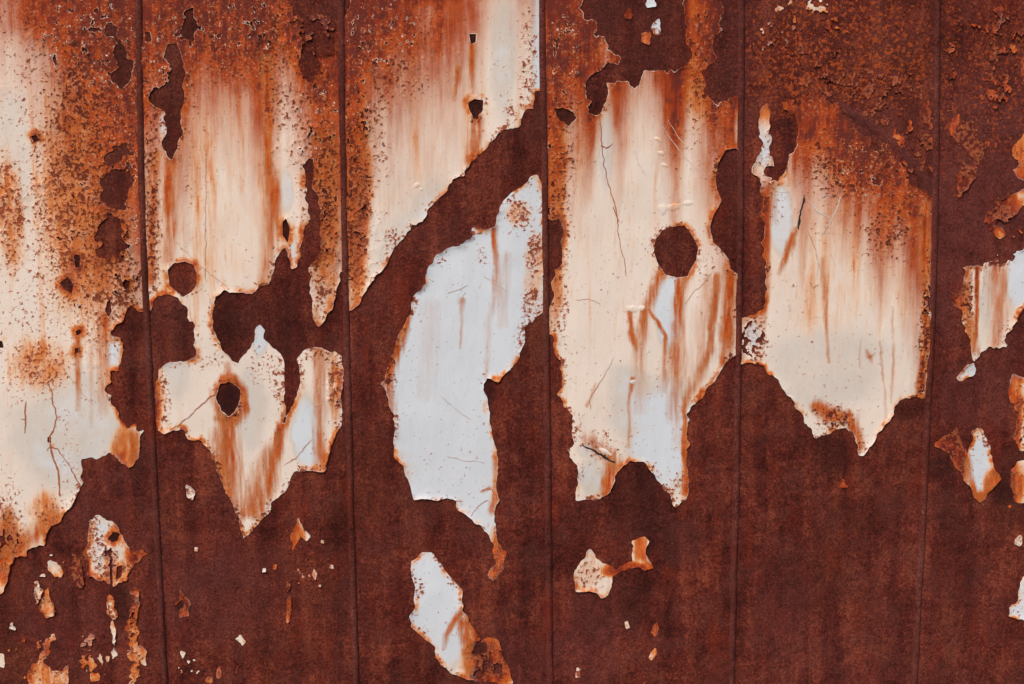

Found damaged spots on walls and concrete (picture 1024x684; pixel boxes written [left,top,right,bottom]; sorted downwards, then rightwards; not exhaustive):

crack [20,362,93,496]
corrosion [0,0,481,287]
corrosion [213,369,291,518]
peeling [0,91,551,684]
spalling [347,79,369,149]
corrosion [545,0,621,219]
corrosion [627,267,690,382]
corrosion [646,0,738,195]
corrosion [674,261,735,495]
peeling [549,0,1024,684]
corrosion [811,401,863,452]
corrosion [783,88,933,399]